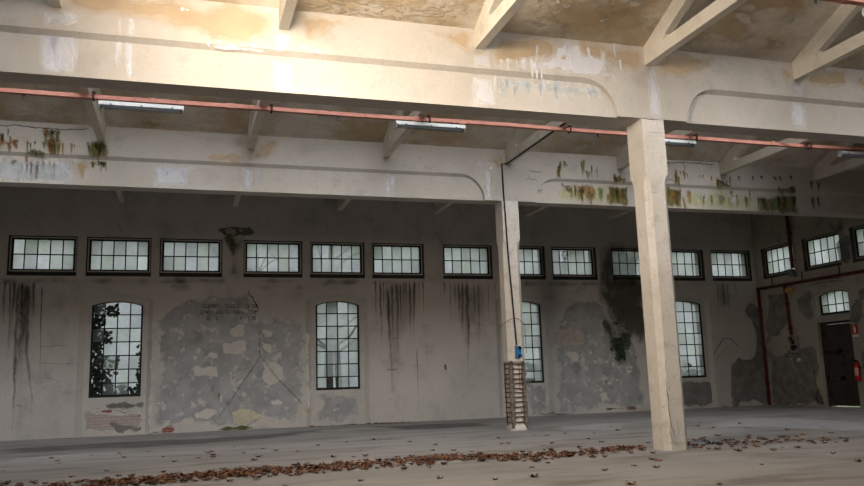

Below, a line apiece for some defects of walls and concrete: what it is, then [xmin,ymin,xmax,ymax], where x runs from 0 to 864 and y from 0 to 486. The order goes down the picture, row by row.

damp [44,36,75,70]
damp [75,0,263,74]
peeling [500,41,627,86]
damp [62,142,108,174]
damp [557,160,627,205]
damp [667,170,691,209]
damp [699,175,796,213]
flaking render [85,297,357,434]
flaking render [558,302,643,410]
flaking render [731,303,768,407]
spalling [503,361,545,429]